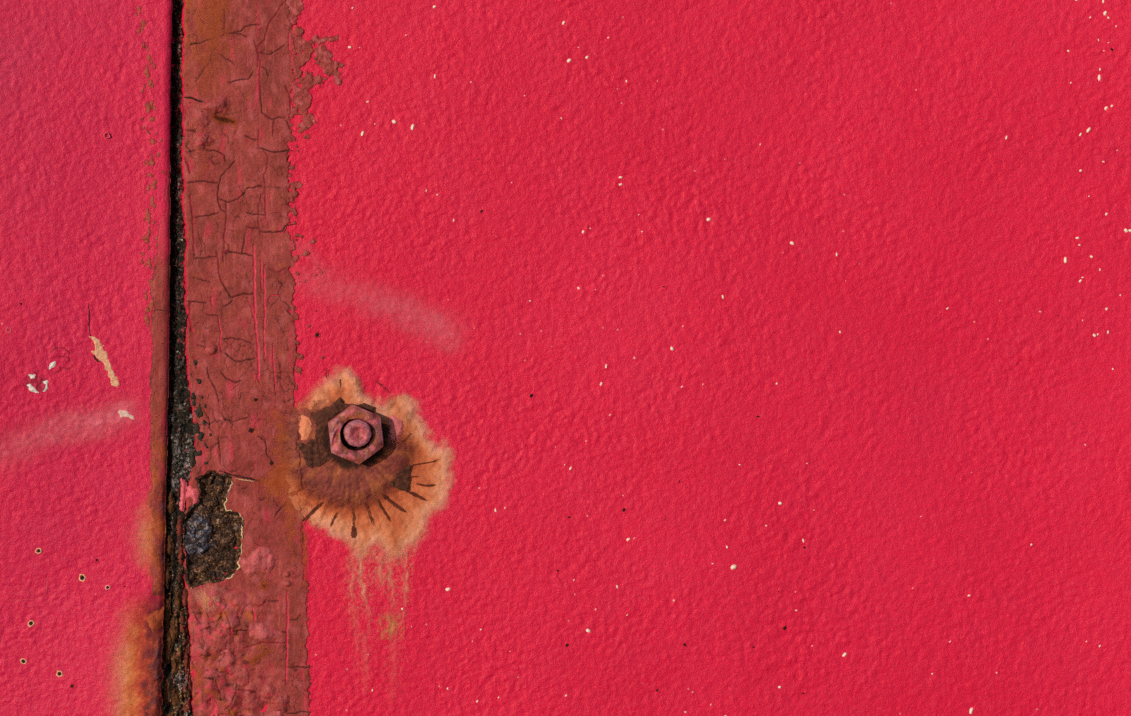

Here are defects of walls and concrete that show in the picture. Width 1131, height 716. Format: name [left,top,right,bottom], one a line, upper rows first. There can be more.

peeling [136,0,345,716]
rust [142,479,166,566]
rust [260,368,454,597]
rust [119,599,164,716]